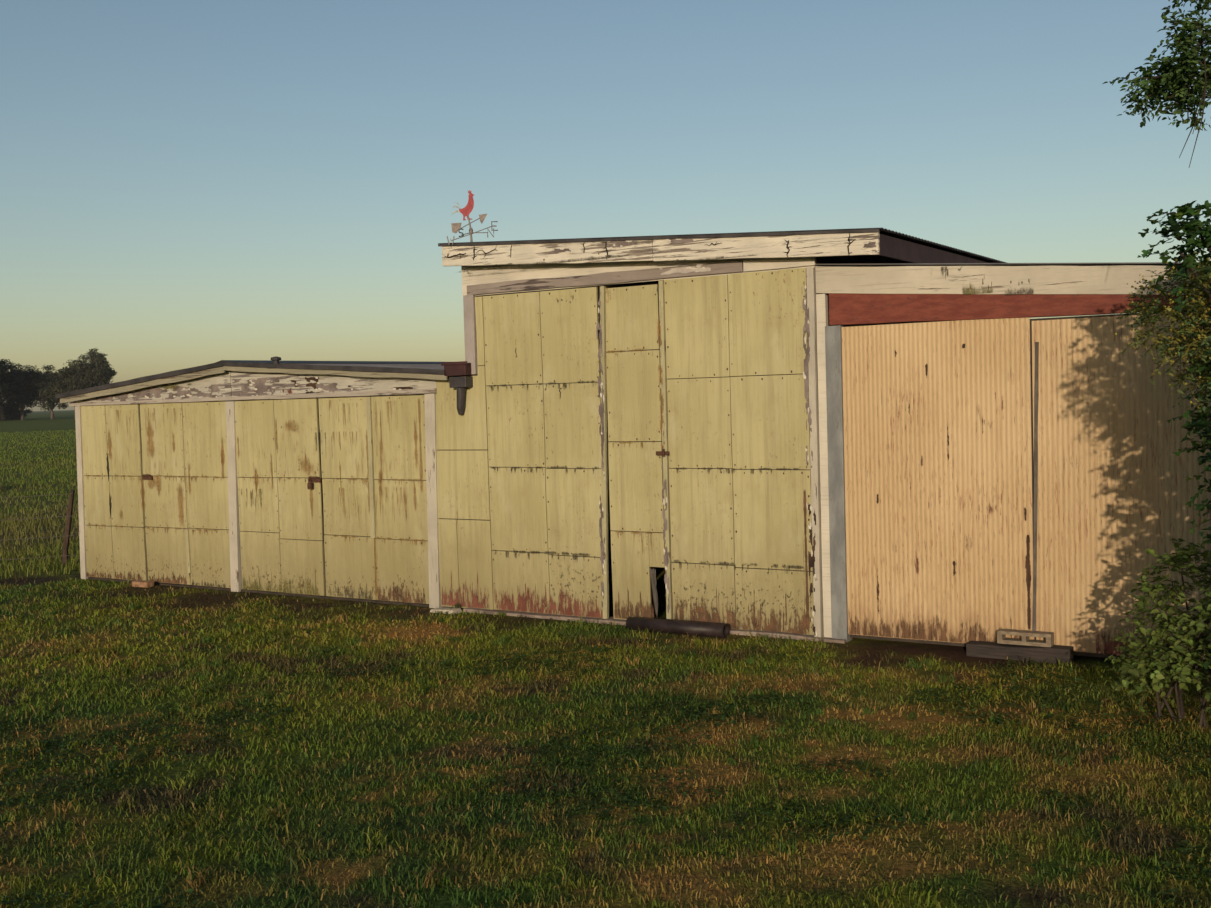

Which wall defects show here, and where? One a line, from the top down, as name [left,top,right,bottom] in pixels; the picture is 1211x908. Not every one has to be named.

peeling [861,241,878,255]
peeling [83,377,353,402]
peeling [802,276,813,468]
rust [141,440,240,521]
rust [401,400,422,505]
rust [342,538,425,604]
rust [441,574,654,619]
rust [675,491,811,634]
rust [849,569,997,643]